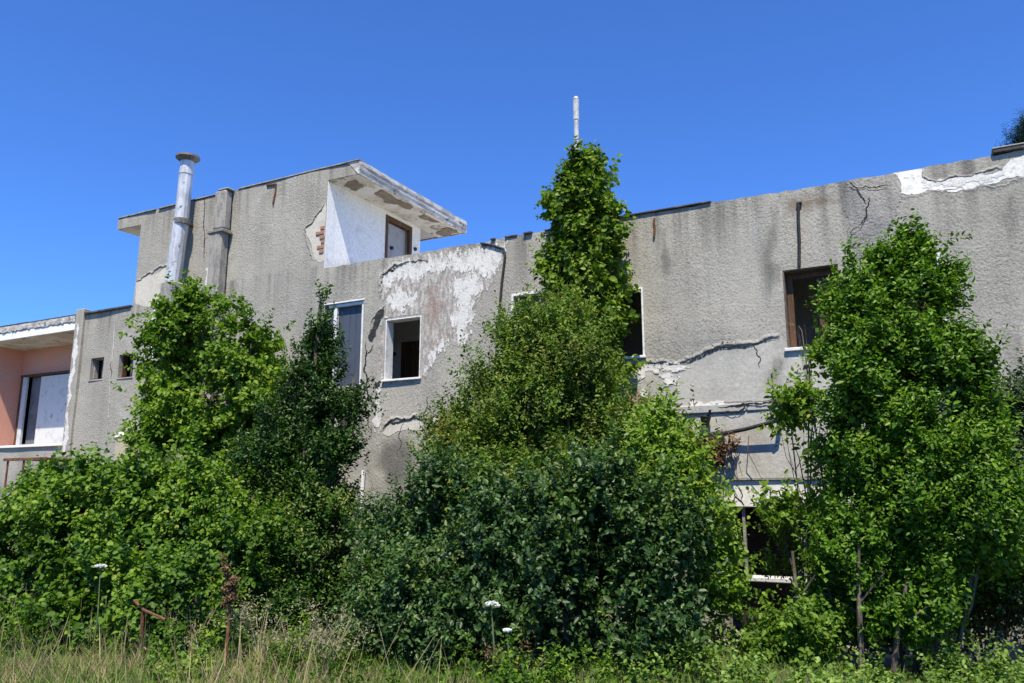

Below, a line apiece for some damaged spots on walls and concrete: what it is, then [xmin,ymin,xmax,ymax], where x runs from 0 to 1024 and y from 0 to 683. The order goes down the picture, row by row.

flaking render [894,155,1024,200]
flaking render [304,202,326,262]
crack [850,182,887,236]
flaking render [367,240,509,434]
crack [648,338,779,368]
flaking render [627,333,836,408]